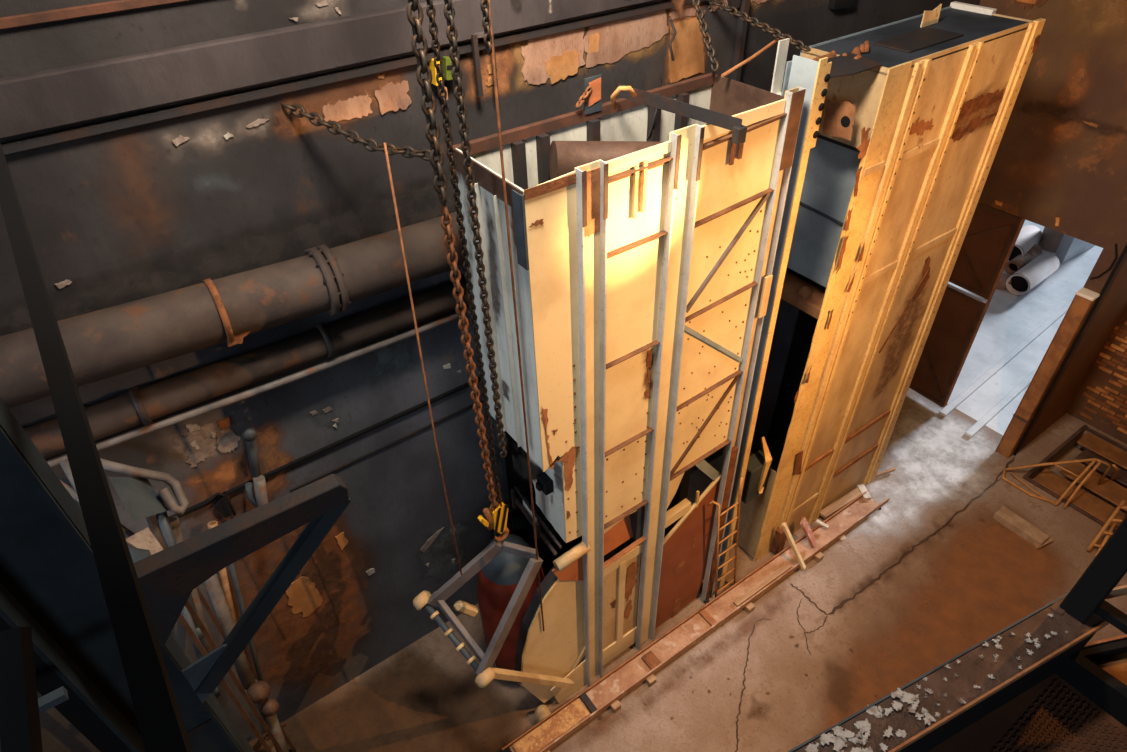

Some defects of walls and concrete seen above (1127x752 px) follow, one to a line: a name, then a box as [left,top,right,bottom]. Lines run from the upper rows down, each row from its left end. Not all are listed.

peeling [172,132,234,146]
peeling [246,70,412,135]
peeling [467,0,728,98]
peeling [168,416,262,525]
spalling [230,522,309,613]
spalling [249,519,375,684]
crack [790,457,1015,655]
crack [735,618,770,752]